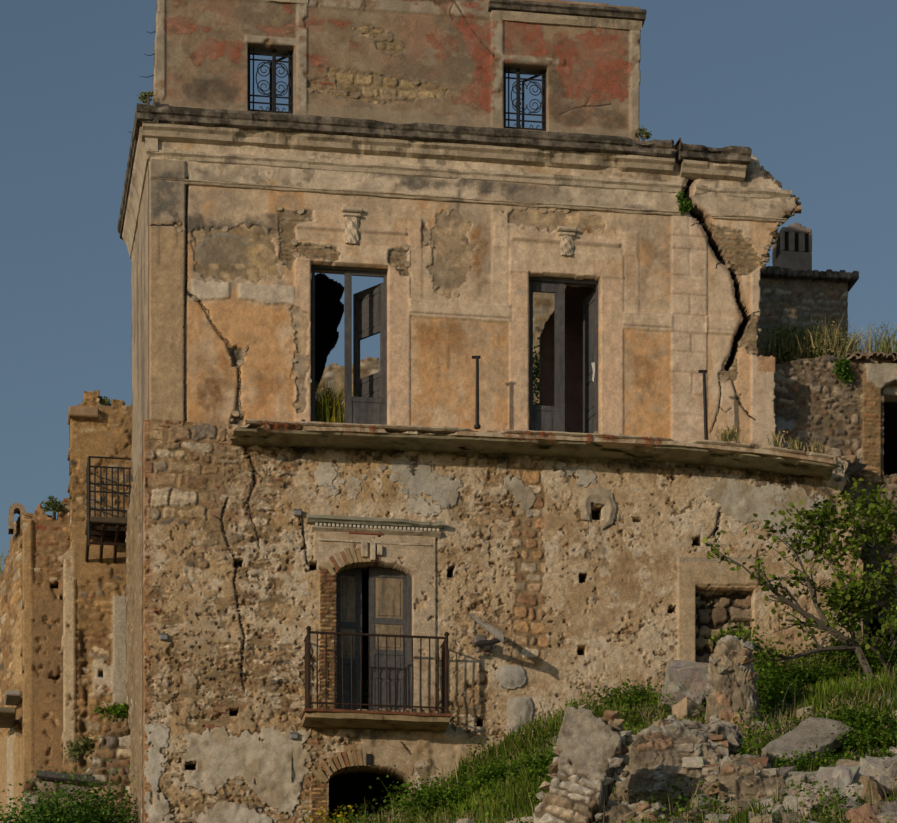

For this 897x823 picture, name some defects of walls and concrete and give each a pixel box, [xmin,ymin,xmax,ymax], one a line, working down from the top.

flaking render [307,55,449,105]
crack [672,138,683,150]
crack [150,177,249,422]
spalling [174,206,340,282]
flaking render [386,244,410,276]
spalling [422,210,476,299]
crack [680,179,759,433]
flaking render [710,195,801,276]
peeling [314,462,367,501]
peeling [380,459,463,518]
crack [214,448,260,694]
peeling [144,722,312,823]